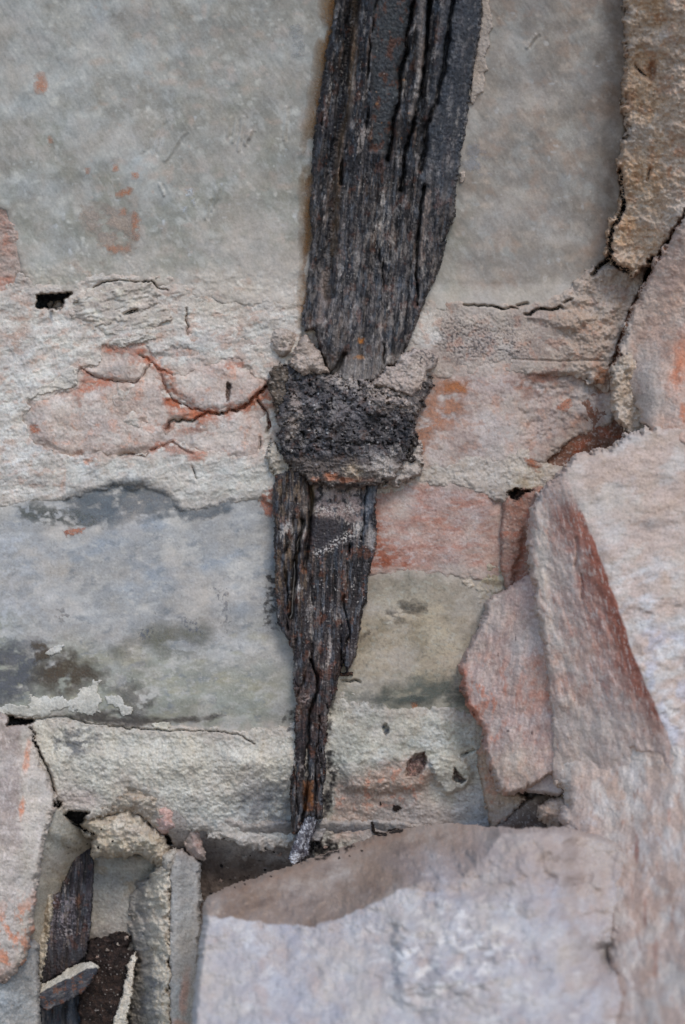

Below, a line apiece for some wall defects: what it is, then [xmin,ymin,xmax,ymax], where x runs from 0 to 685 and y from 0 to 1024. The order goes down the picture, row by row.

crack [466,299,571,316]
crack [519,170,685,365]
crack [83,355,271,479]
leakage [21,480,230,525]